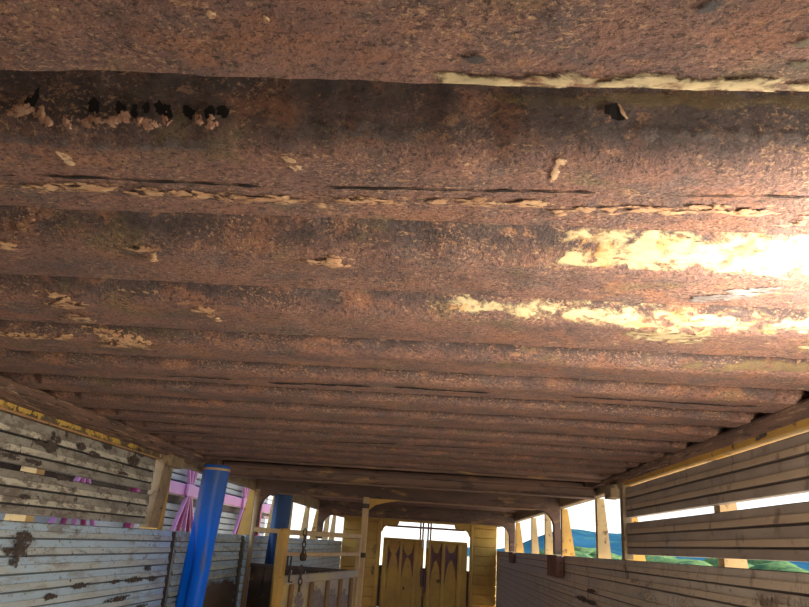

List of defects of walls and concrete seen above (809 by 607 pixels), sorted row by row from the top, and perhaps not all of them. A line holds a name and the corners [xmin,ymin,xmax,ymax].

peeling [435,73,809,92]
corrosion [0,102,172,132]
crack [47,176,261,188]
corrosion [0,182,448,208]
crack [331,186,595,194]
corrosion [458,197,772,217]
peeling [558,228,809,276]
water stain [688,287,782,302]
corrosion [33,289,163,350]
peeling [448,294,809,352]
crack [395,386,487,394]
peeling [56,419,139,450]